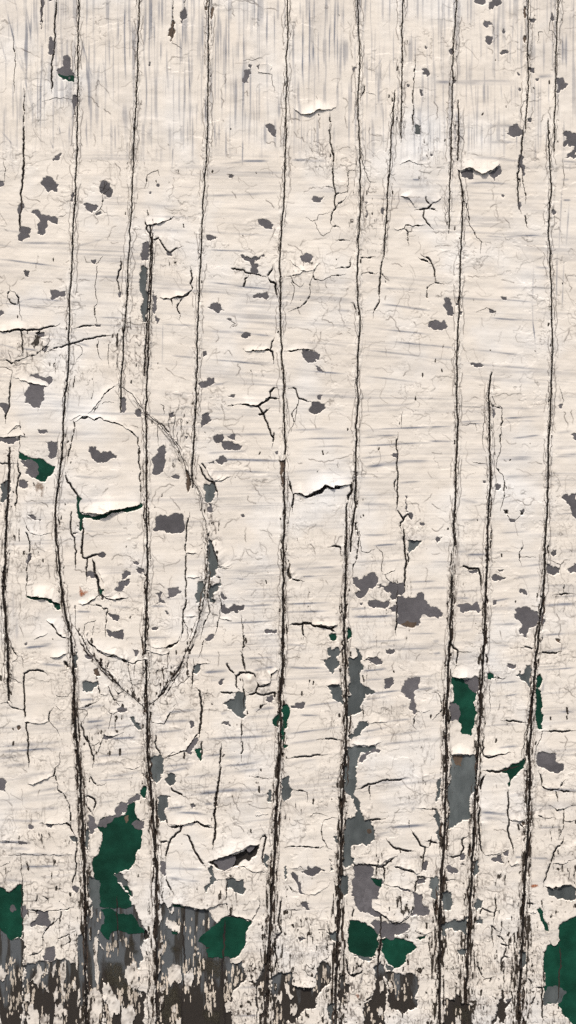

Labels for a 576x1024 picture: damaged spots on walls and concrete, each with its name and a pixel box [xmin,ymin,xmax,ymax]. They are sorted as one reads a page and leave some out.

crack [244,57,290,180]
crack [525,0,559,213]
peeling [17,203,58,241]
peeling [24,374,53,408]
crack [0,0,232,1023]
peeling [352,572,443,628]
crack [225,205,576,1024]
peeling [70,755,176,856]
peeling [284,647,483,940]
peeling [24,869,146,1024]
peeling [204,845,269,894]
peeling [547,885,576,901]